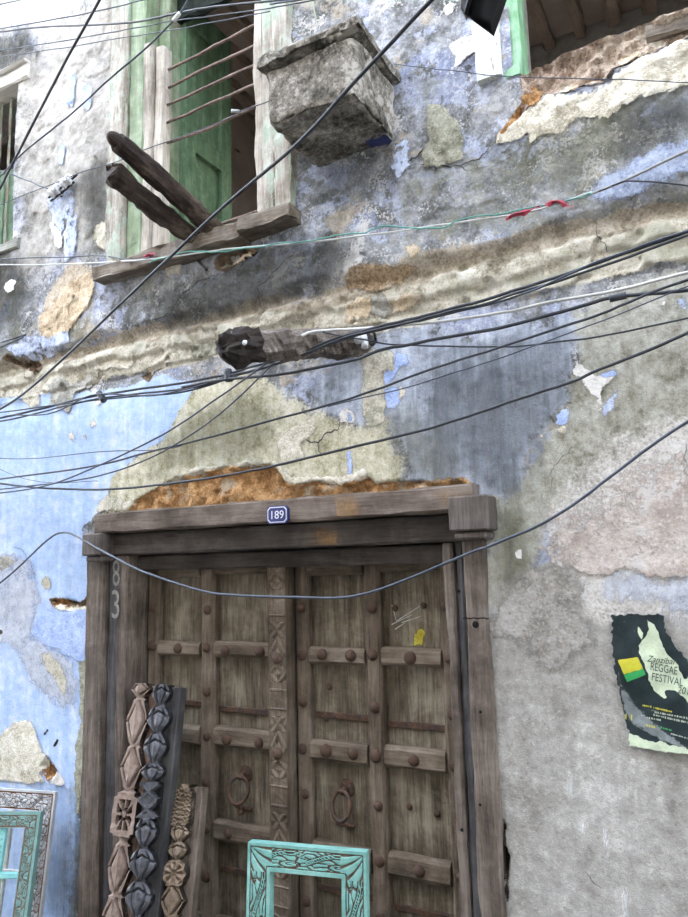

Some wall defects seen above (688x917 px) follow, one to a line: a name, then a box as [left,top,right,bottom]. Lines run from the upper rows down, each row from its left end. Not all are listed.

peeling [496,7,688,144]
peeling [366,135,410,178]
peeling [422,103,465,168]
peeling [2,271,94,375]
peeling [21,351,133,413]
flaking render [140,359,170,382]
peeling [190,342,216,358]
peeling [339,349,409,427]
peeling [573,361,620,416]
flaking render [97,421,471,513]
peeling [0,553,86,815]